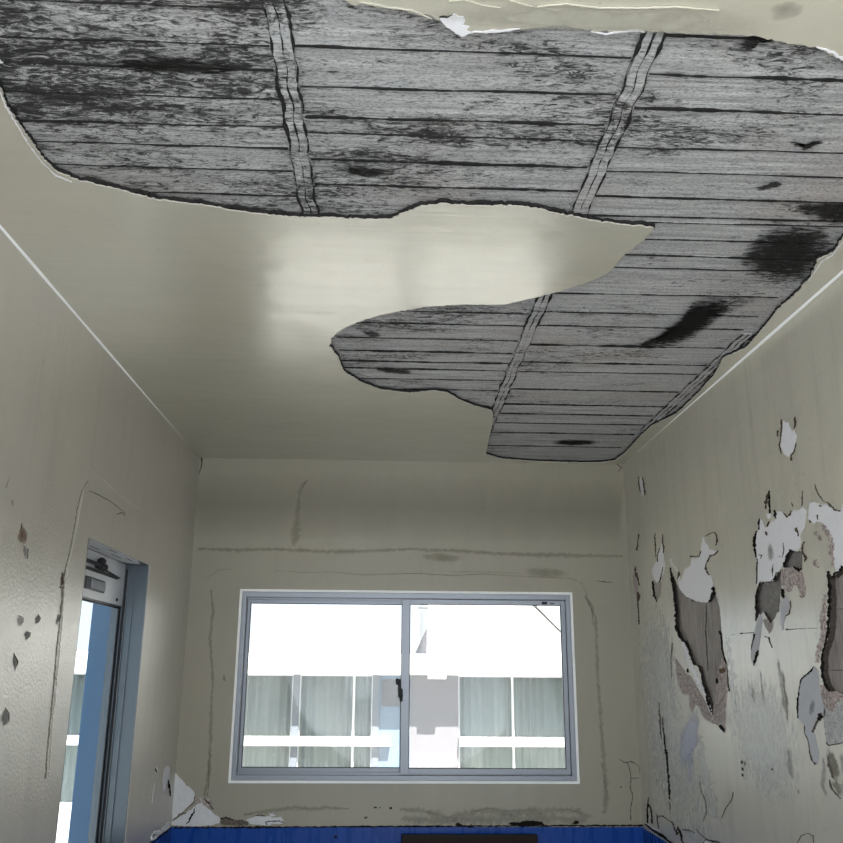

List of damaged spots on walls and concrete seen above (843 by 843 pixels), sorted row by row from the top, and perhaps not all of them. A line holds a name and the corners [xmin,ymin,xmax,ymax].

spalling [0,0,843,462]
crack [45,461,154,779]
peeling [151,766,284,843]
peeling [633,567,641,624]
spalling [645,532,730,816]
peeling [751,502,843,799]